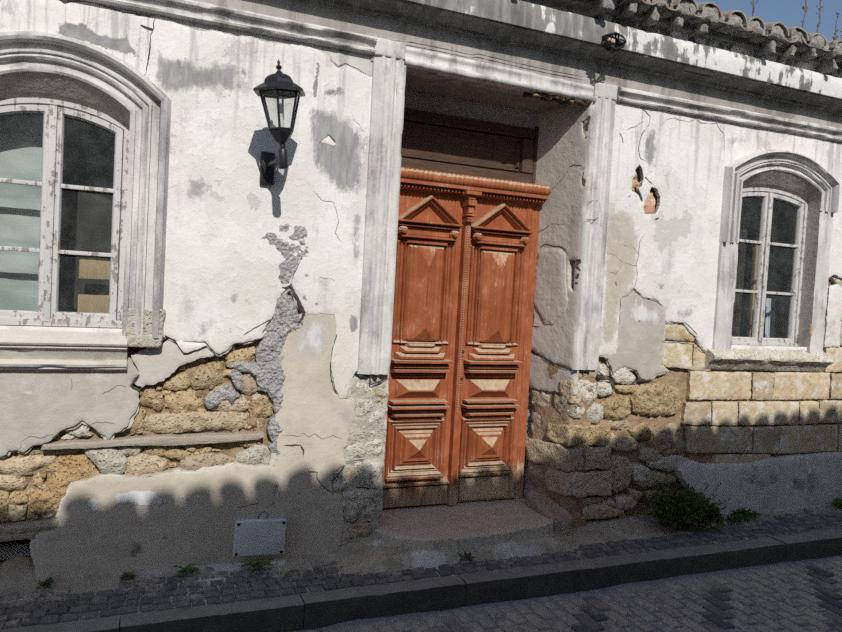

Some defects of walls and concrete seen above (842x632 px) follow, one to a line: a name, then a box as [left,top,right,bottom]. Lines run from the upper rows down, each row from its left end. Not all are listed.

crack [60,0,280,79]
leakage [158,57,245,91]
spalling [644,192,656,214]
spalling [0,345,274,521]
crack [283,433,365,493]
spalling [525,313,842,520]